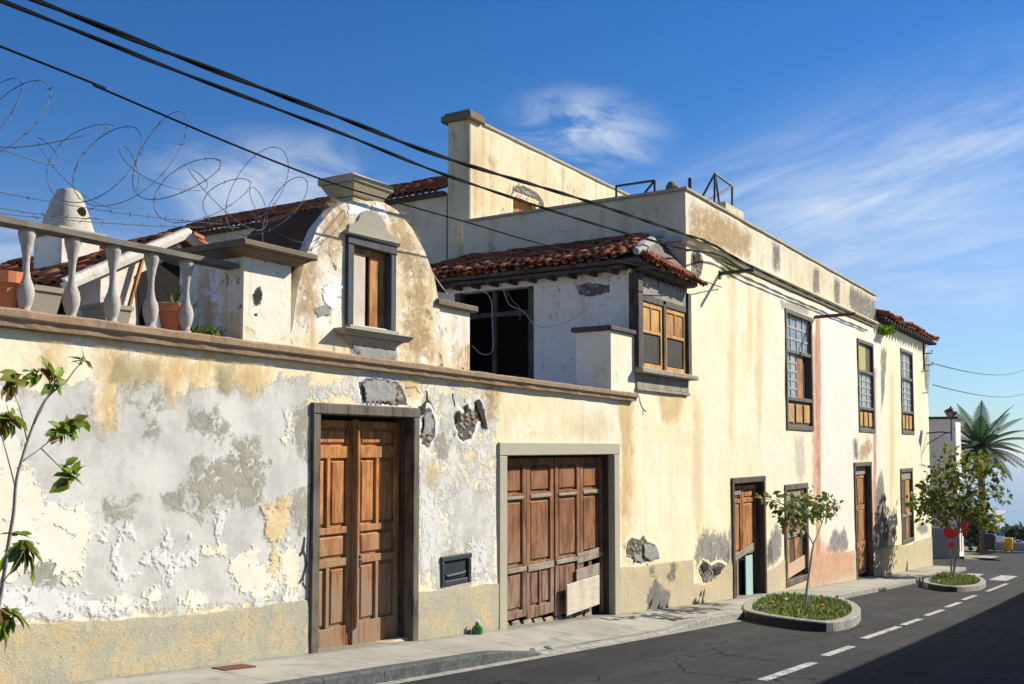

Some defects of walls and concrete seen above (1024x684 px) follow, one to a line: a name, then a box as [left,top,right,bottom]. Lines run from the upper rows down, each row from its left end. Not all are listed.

spalling [250,286,263,316]
spalling [574,280,613,300]
water stain [834,280,876,321]
water stain [142,394,165,436]
water stain [104,494,139,524]
water stain [161,402,311,585]
peeling [0,371,498,624]
water stain [30,563,59,586]
spalling [623,530,678,610]
spalling [696,557,727,585]